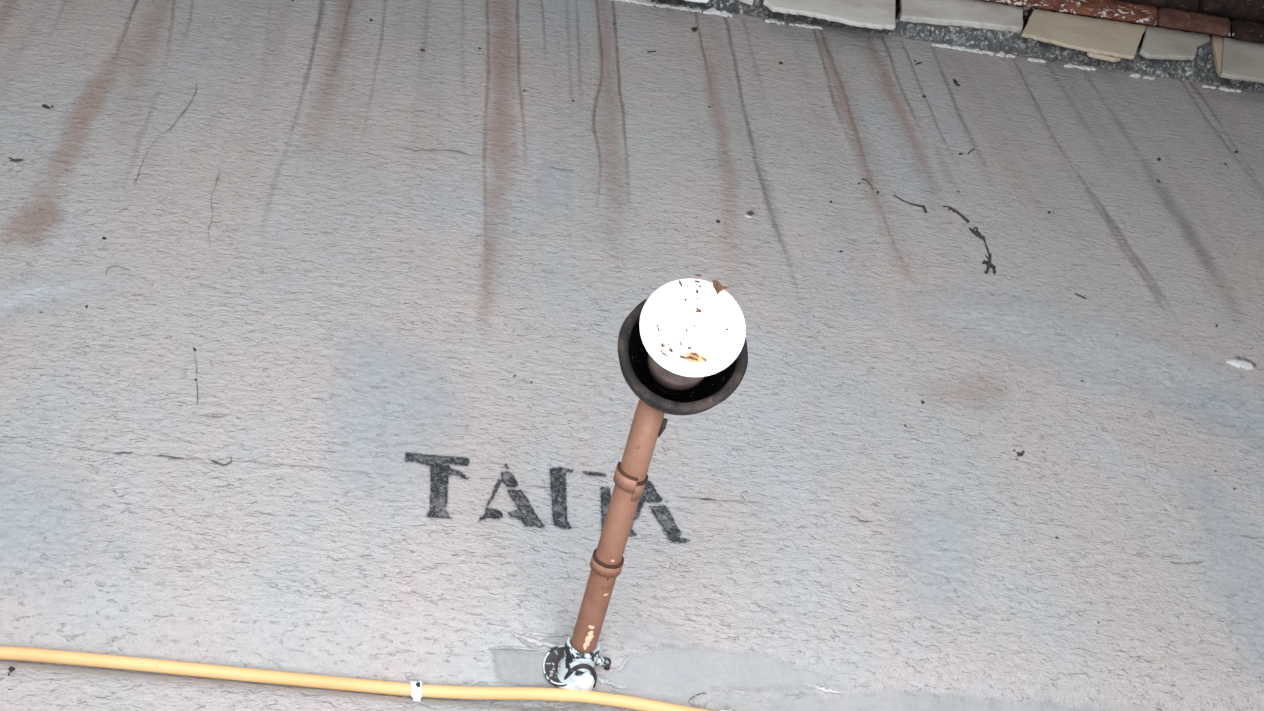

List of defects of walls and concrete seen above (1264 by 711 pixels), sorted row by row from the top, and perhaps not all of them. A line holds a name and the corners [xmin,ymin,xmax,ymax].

water stain [0,282,72,315]